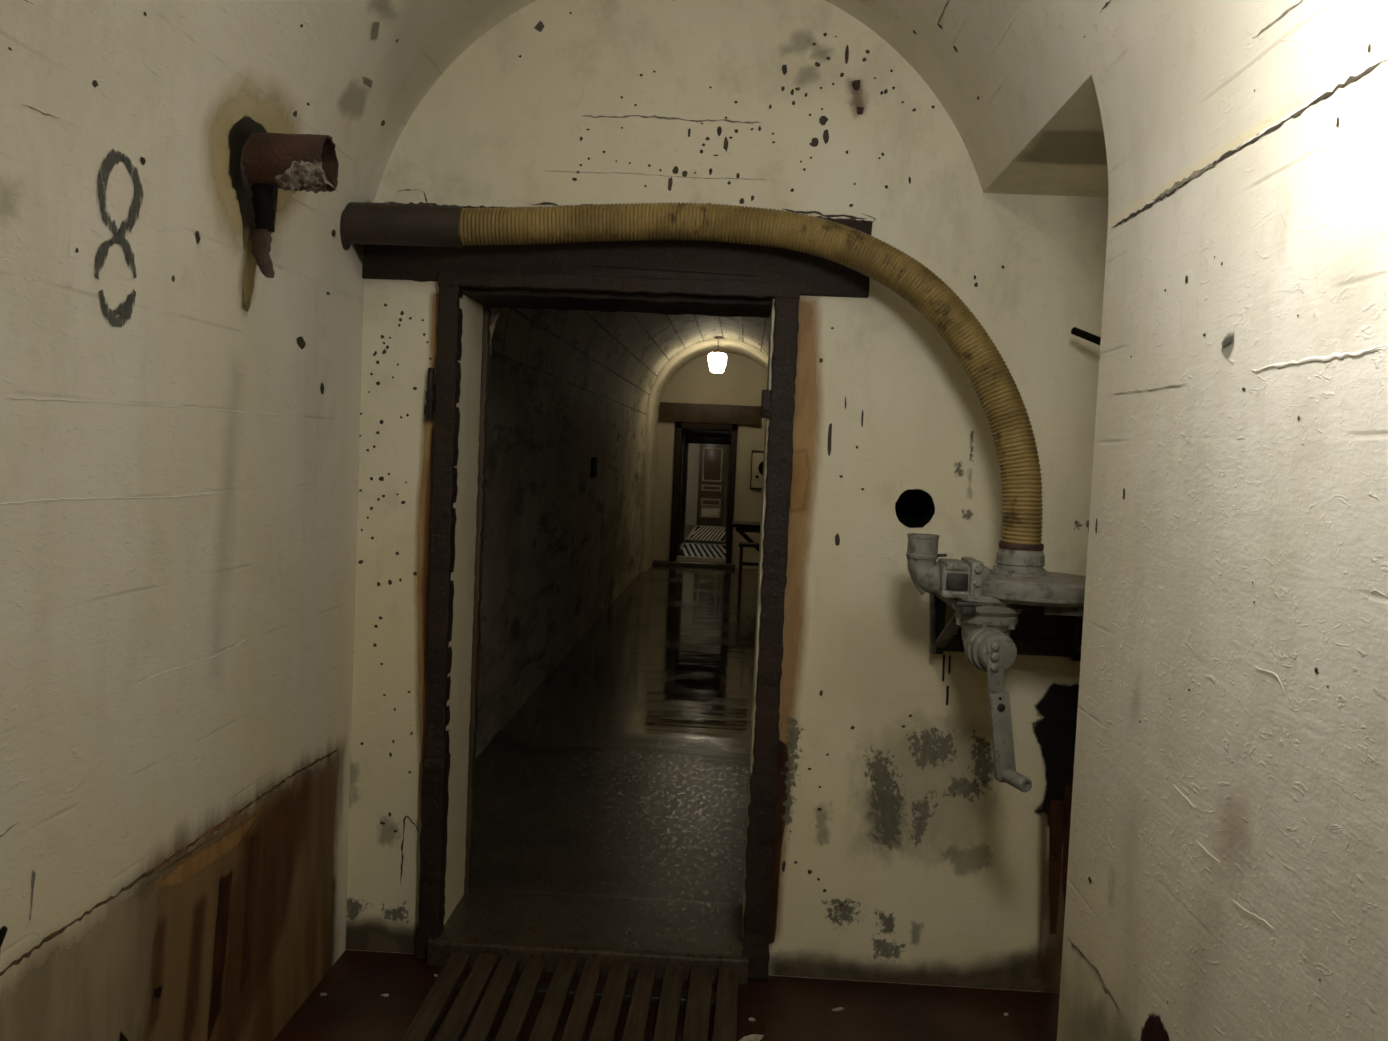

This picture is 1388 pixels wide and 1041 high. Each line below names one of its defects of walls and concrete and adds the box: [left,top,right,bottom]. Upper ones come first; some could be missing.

crack [1253,0,1302,38]
rust [213,94,293,301]
crack [1113,59,1388,227]
water stain [865,727,995,850]
water stain [0,870,165,1041]
water stain [769,786,1073,993]